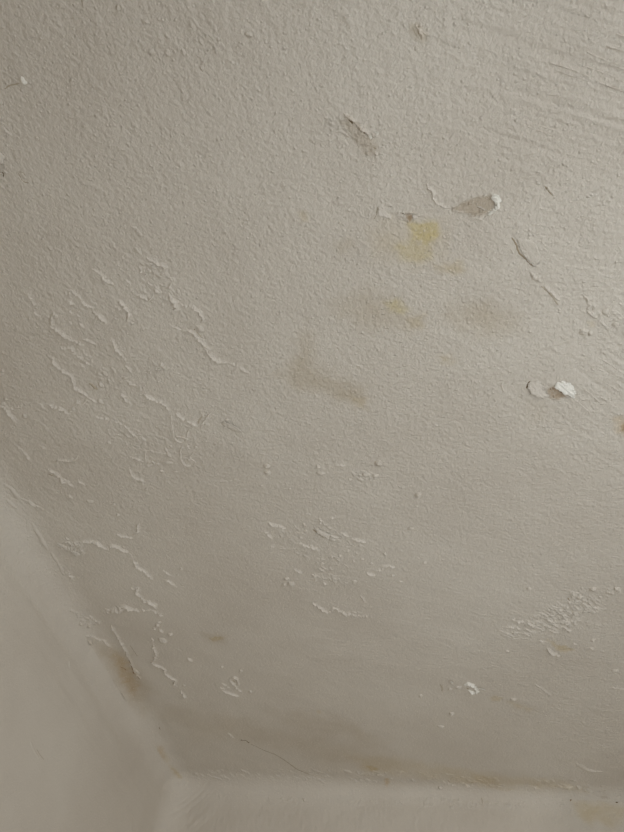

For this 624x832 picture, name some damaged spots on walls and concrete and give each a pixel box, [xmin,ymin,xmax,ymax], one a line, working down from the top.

peeling [450,193,501,221]
damp [319,203,540,368]
damp [265,325,379,414]
peeling [515,381,576,434]
peeling [498,587,622,641]